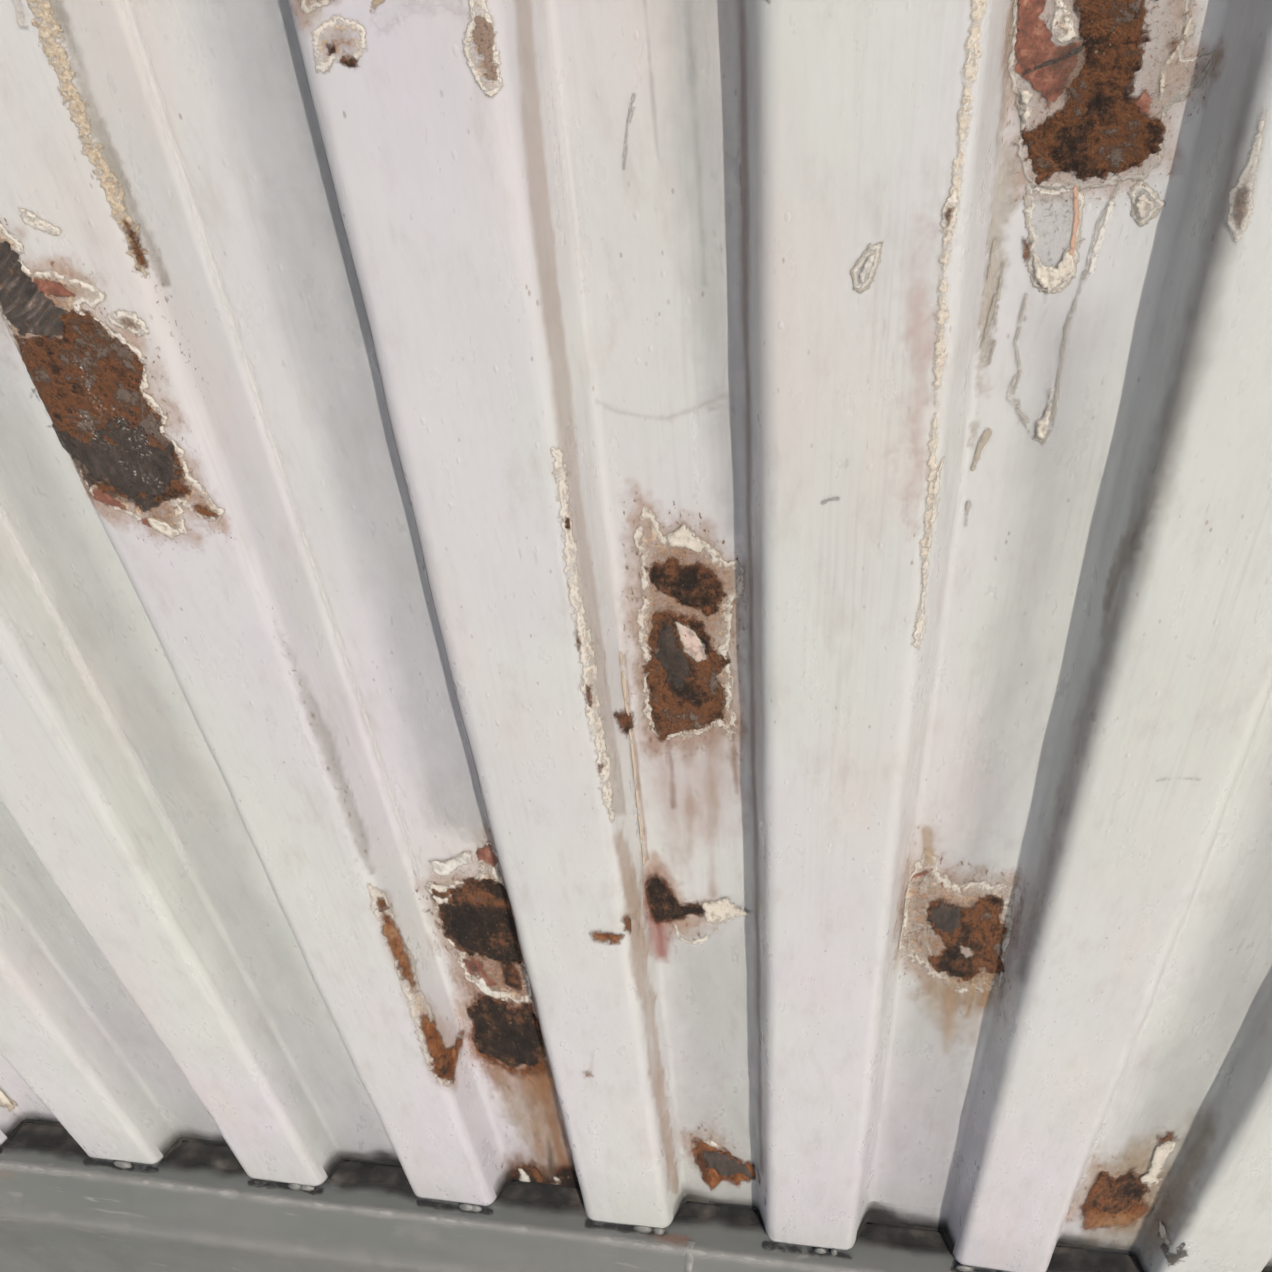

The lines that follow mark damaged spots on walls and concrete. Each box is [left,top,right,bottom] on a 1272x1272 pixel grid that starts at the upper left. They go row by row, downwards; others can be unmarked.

peeling [15,0,204,397]
rust [0,218,232,543]
peeling [311,15,367,73]
peeling [462,0,503,97]
peeling [913,0,988,649]
peeling [979,161,1165,444]
rust [1002,0,1218,208]
peeling [550,447,645,866]
rust [622,488,749,761]
rust [367,830,581,1190]
rust [893,827,1029,1013]
rust [685,1124,760,1190]